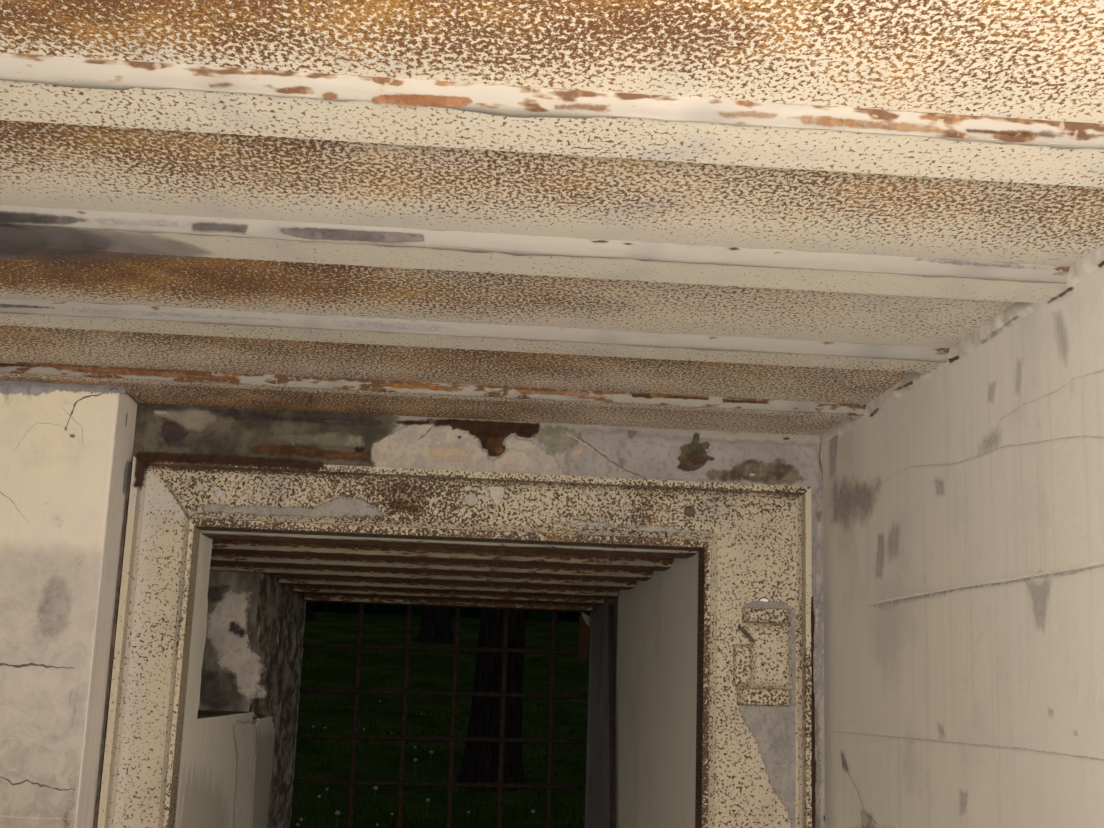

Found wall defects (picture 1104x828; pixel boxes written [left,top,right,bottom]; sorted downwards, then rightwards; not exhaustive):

rust [372,94,472,107]
rust [801,116,1055,137]
rust [52,365,237,380]
crack [14,387,139,451]
rust [397,419,540,456]
spalling [371,423,822,495]
peeling [464,487,504,506]
crack [868,559,1104,606]
peeling [200,585,266,707]
crack [0,662,73,670]
peeling [739,601,796,828]
crack [0,764,76,791]